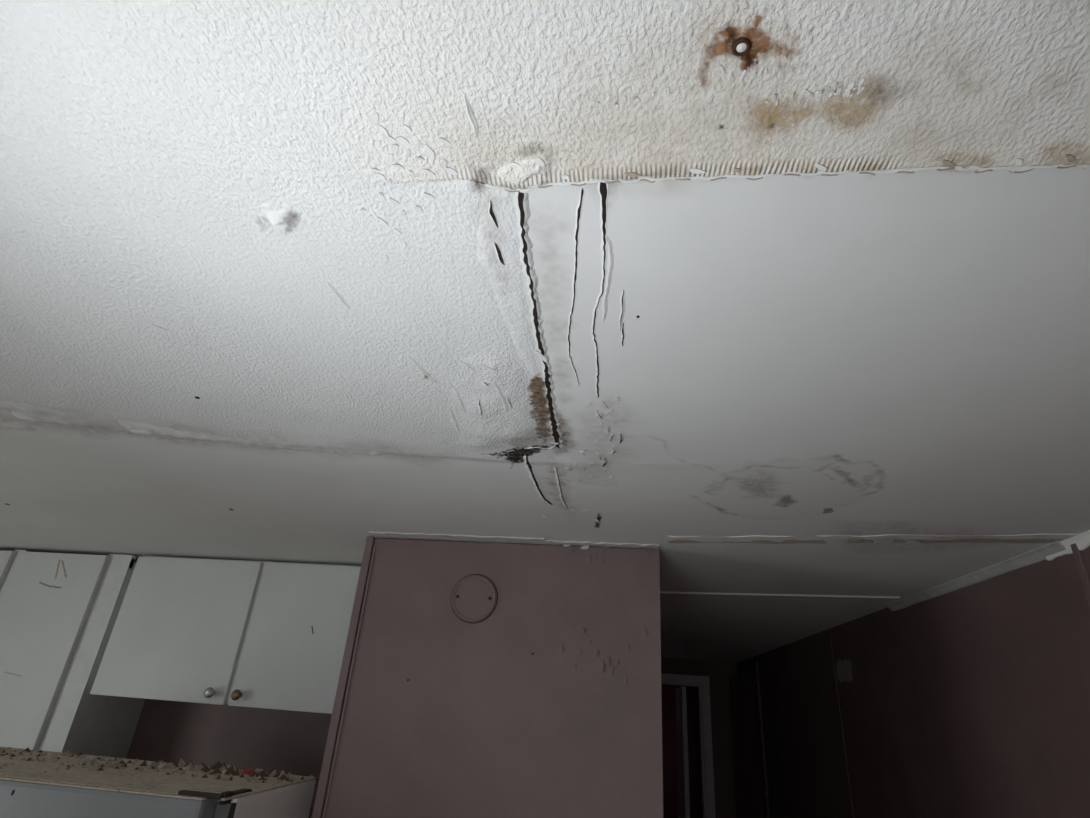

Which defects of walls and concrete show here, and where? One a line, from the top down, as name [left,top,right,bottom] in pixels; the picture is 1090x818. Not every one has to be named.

rust [705,16,792,69]
leakage [757,105,810,130]
peeling [764,79,865,106]
crack [514,182,626,508]